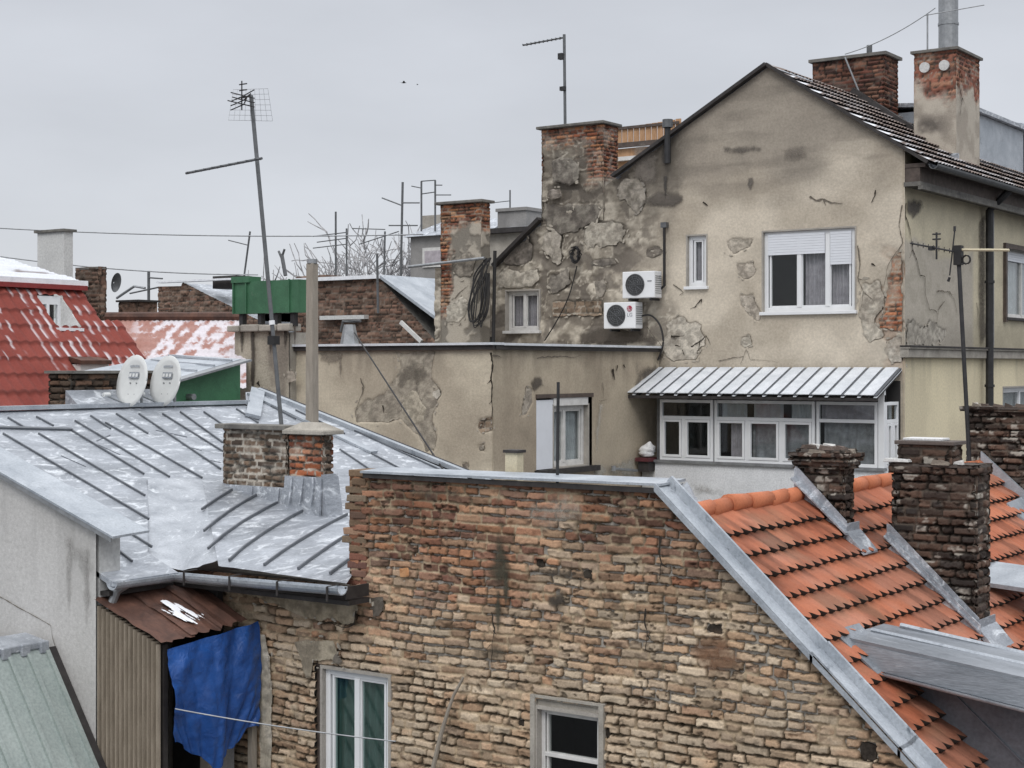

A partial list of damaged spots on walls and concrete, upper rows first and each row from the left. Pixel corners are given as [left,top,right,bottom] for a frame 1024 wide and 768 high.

spalling [496,157,630,288]
spalling [617,178,646,215]
flaking render [724,238,756,280]
spalling [550,280,607,319]
spalling [661,299,708,363]
flaking render [740,293,760,348]
spalling [856,249,947,346]
flaking render [351,350,441,452]
crack [486,352,494,420]